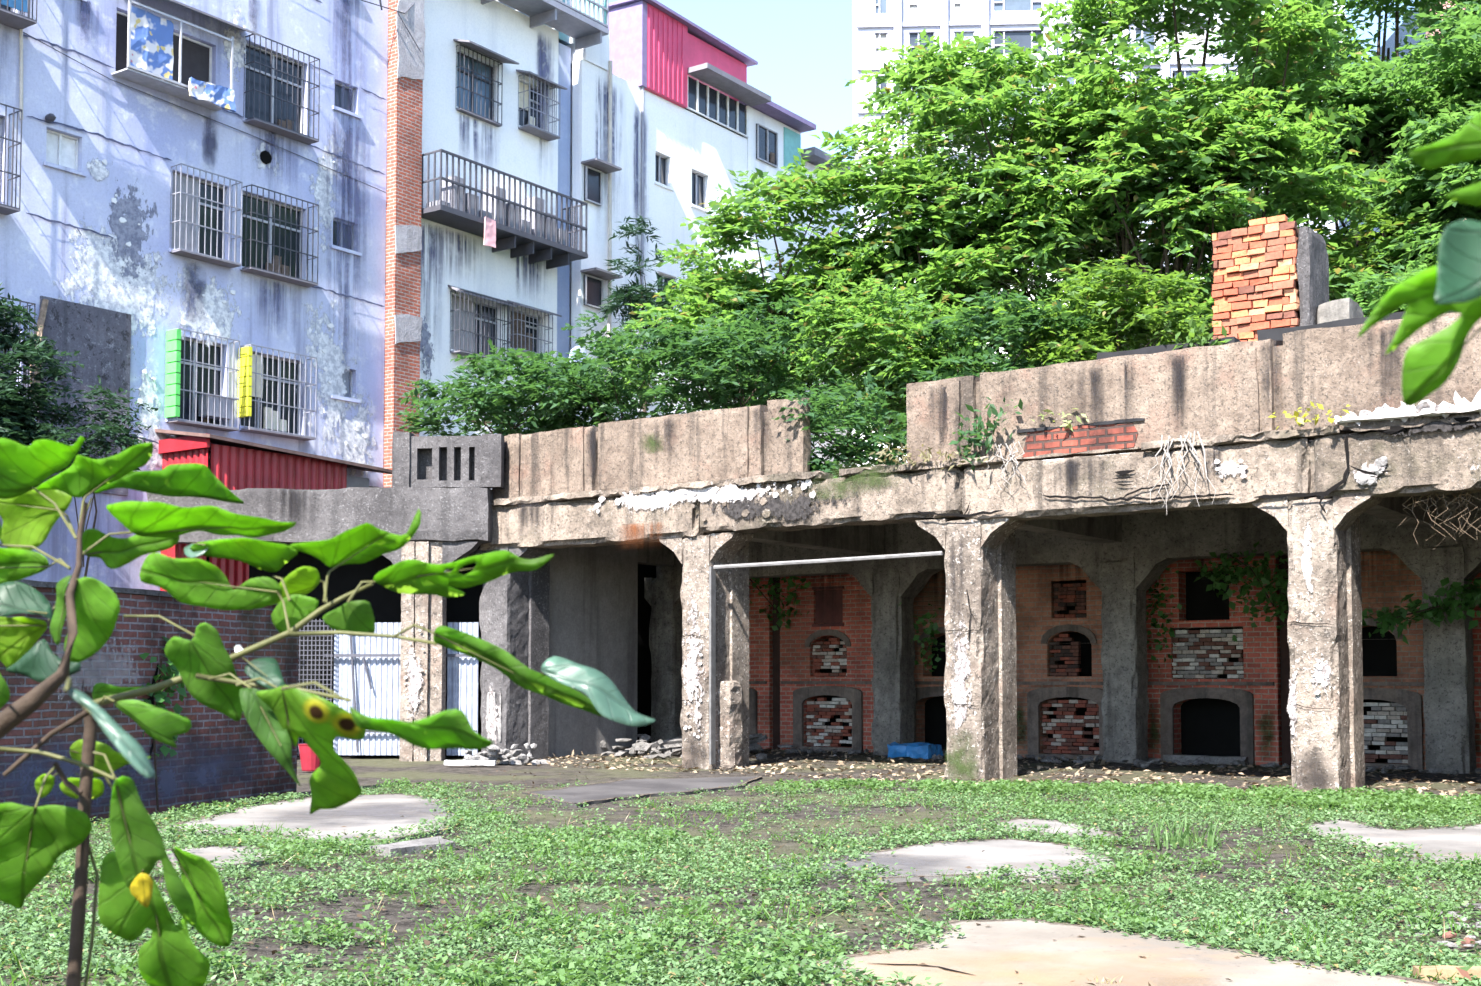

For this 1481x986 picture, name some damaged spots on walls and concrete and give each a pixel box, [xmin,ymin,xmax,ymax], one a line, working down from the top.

damp [336,0,359,61]
damp [205,122,216,160]
damp [334,130,361,261]
damp [422,230,466,279]
damp [517,255,538,281]
peeling [53,159,250,471]
peeling [1335,390,1481,437]
spalling [1354,456,1388,485]
peeling [590,479,859,525]